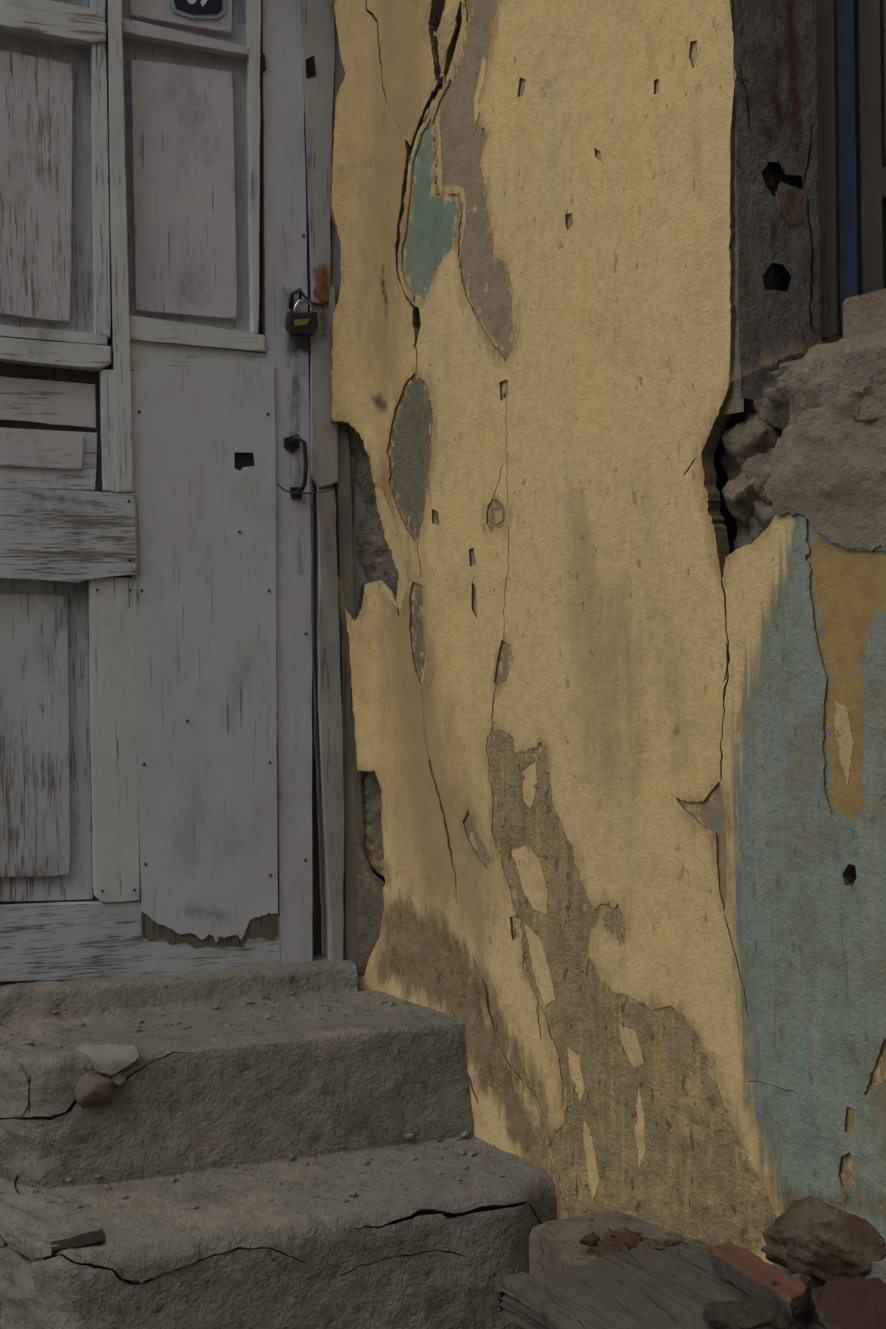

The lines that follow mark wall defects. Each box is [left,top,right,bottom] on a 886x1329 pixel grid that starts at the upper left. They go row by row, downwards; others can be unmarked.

damp [373,0,419,343]
crack [412,303,421,331]
crack [405,0,457,190]
flaking render [398,0,513,361]
flaking render [351,374,439,686]
damp [396,604,462,881]
peeling [807,520,886,821]
crack [25,1100,76,1119]
crack [9,1246,149,1284]
crack [360,1203,519,1229]
damp [378,899,560,1200]